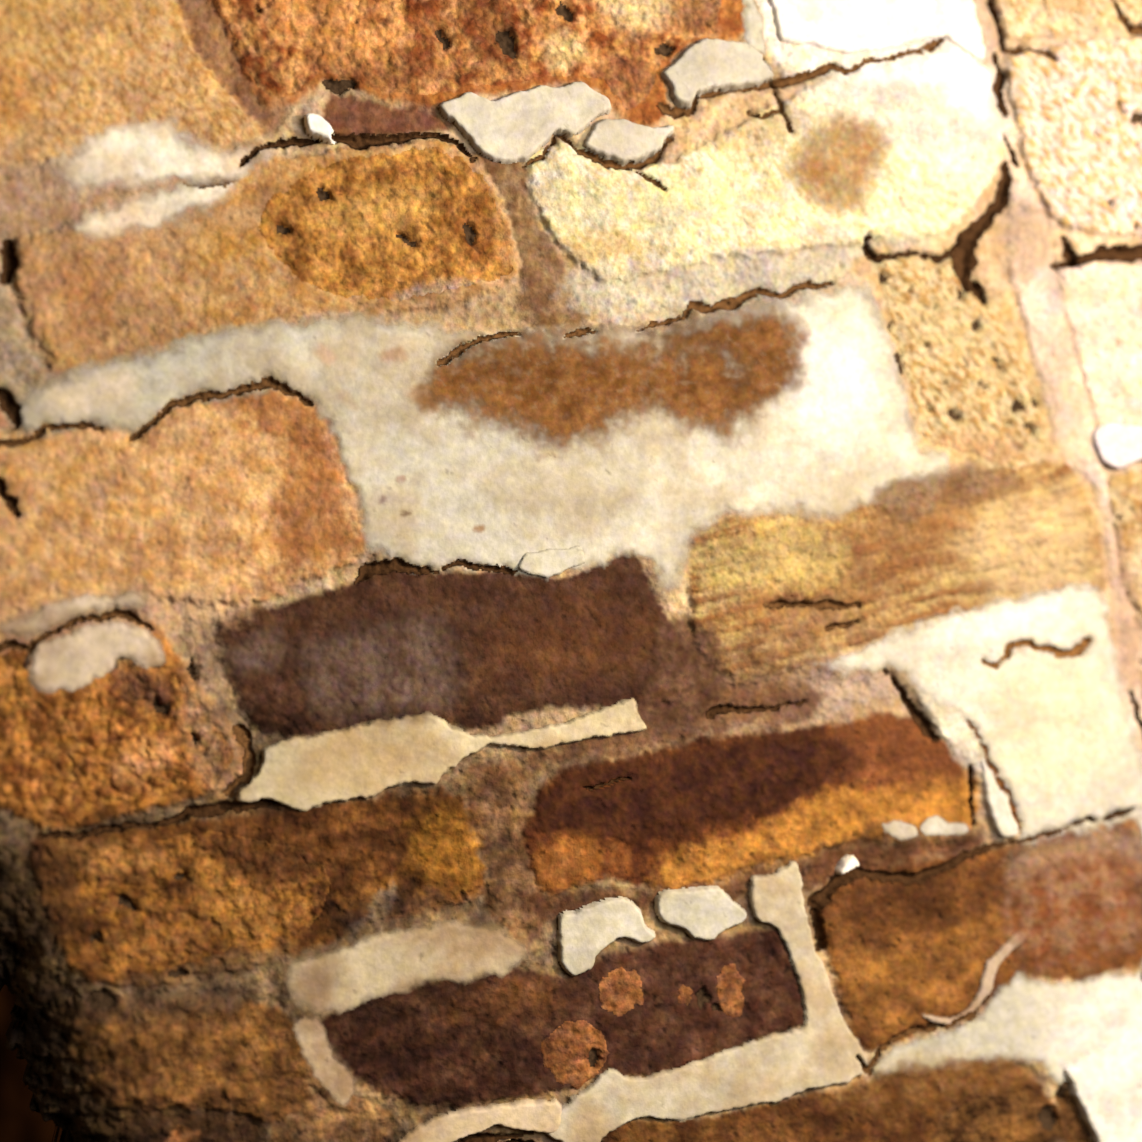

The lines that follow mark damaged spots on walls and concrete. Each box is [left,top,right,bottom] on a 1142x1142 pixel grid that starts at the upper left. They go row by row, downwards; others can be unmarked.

spalling [216,0,1012,303]
crack [523,38,944,191]
crack [862,0,1057,305]
crack [1050,235,1142,271]
crack [130,376,314,441]
leakage [423,313,807,447]
peeling [831,584,1142,843]
crack [981,637,1093,670]
peeling [835,855,859,875]
crack [808,719,1135,951]
flaking render [287,921,525,1104]
peeling [398,861,1142,1142]